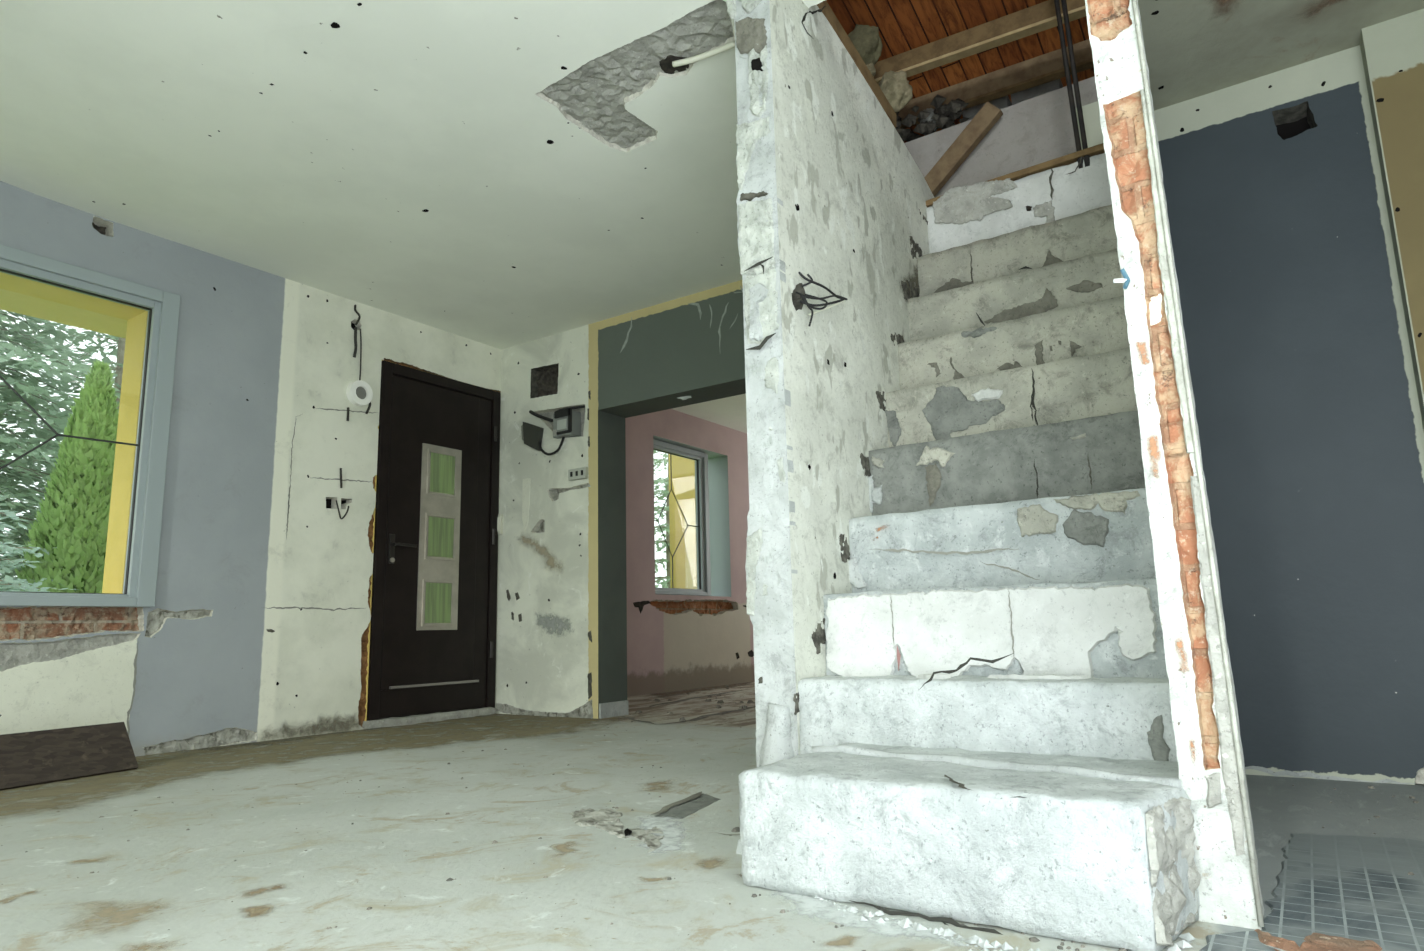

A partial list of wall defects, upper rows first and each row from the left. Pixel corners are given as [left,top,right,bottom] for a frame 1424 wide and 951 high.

flaking render [1087,0,1132,41]
spalling [535,0,805,344]
spalling [932,178,1055,227]
spalling [961,280,1103,338]
spalling [997,340,1084,371]
spalling [922,357,1005,440]
spalling [1063,509,1109,547]
flaking render [1103,89,1246,946]
flaking render [633,528,763,616]
flaking render [0,606,213,672]
crack [869,548,1040,689]
peeling [825,583,1157,680]